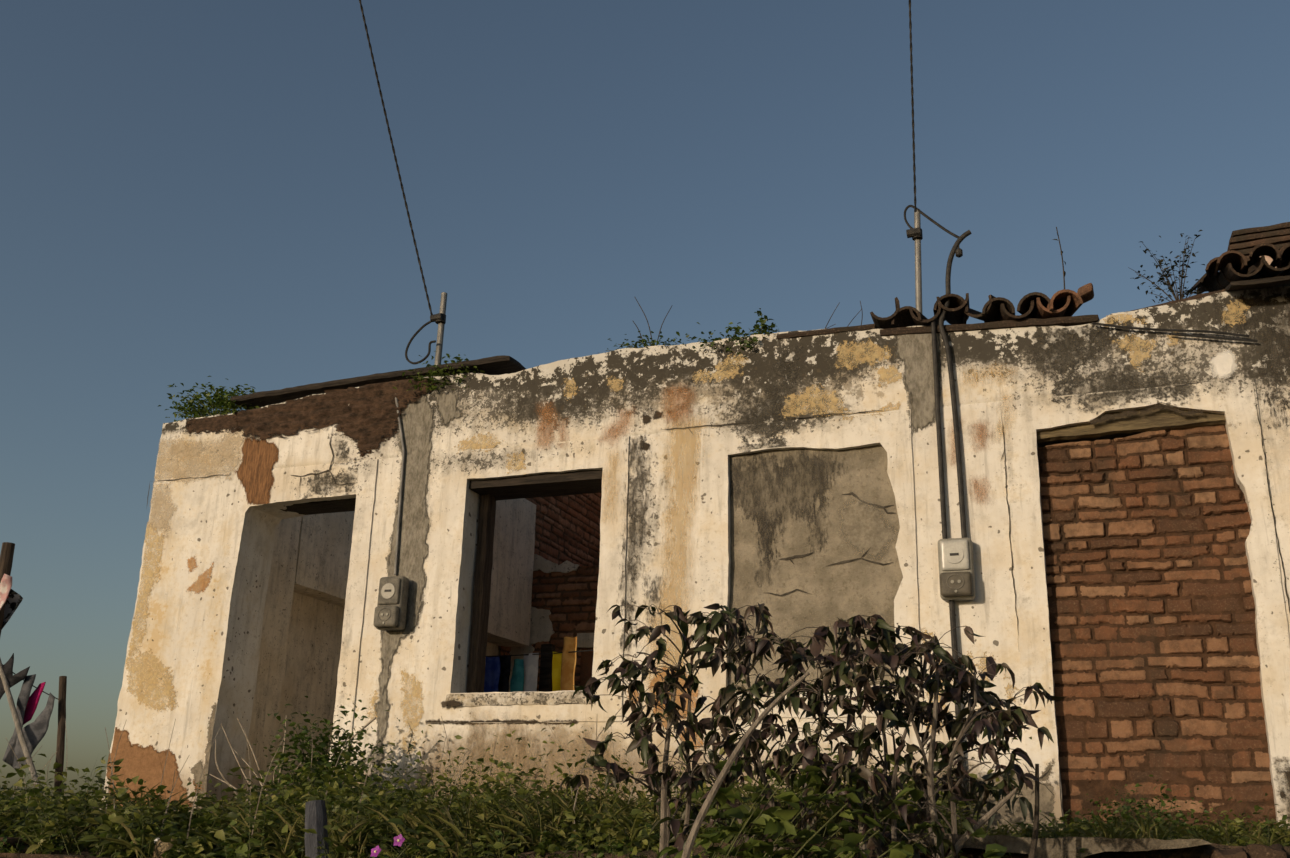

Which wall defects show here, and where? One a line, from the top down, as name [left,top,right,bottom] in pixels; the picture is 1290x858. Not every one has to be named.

flaking render [781,338,902,420]
leakage [1024,323,1200,414]
mould [1205,285,1290,428]
flaking render [125,377,463,710]
flaking render [454,432,526,474]
leakage [608,427,699,678]
crack [1254,393,1290,613]
flaking render [106,704,216,809]
leakage [1274,758,1290,816]